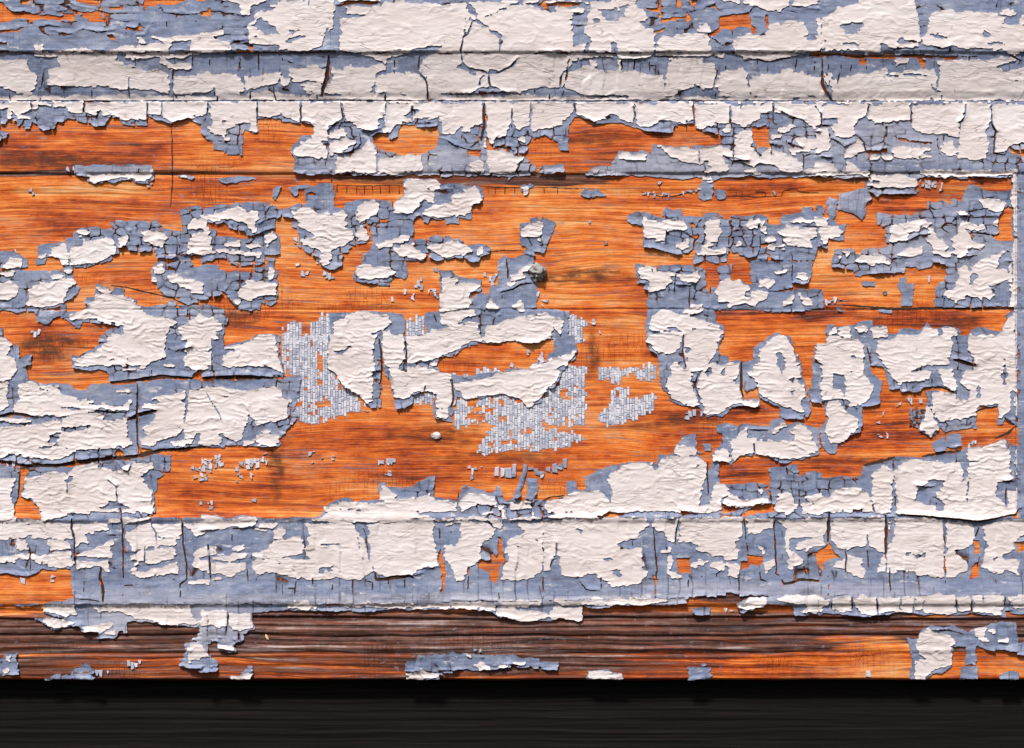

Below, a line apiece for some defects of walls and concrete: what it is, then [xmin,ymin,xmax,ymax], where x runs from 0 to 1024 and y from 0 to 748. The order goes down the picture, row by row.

peeling [0,0,191,104]
crack [252,55,330,101]
crack [348,26,695,148]
peeling [464,0,1024,104]
peeling [718,365,1022,521]
crack [99,508,133,602]
peeling [0,607,443,680]
peeling [0,519,687,653]
crack [374,573,413,588]
peeling [208,516,1024,680]
crack [773,518,819,585]
crack [884,508,1021,554]